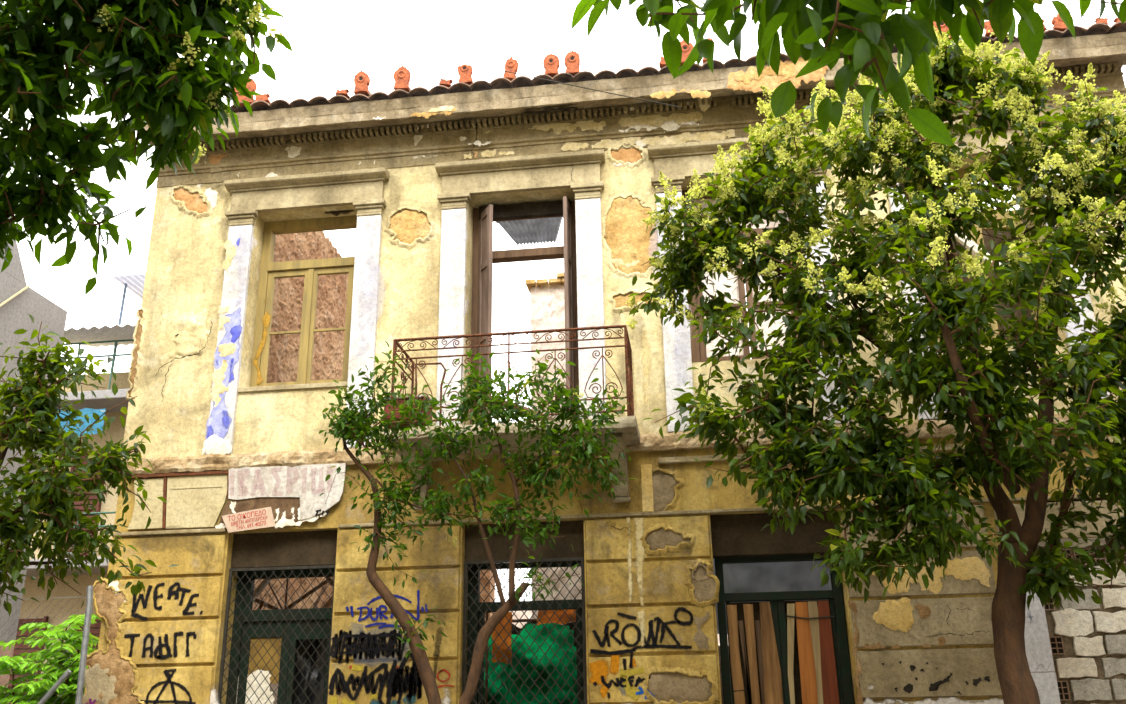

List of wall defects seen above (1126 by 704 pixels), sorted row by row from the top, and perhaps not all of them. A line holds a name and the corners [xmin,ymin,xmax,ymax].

spalling [727,56,828,93]
peeling [528,88,735,169]
spalling [169,184,218,219]
spalling [384,206,436,250]
spalling [601,192,659,313]
crack [155,320,212,401]
peeling [202,305,242,455]
spalling [637,467,720,650]
peeling [872,556,991,632]
spalling [82,577,144,704]
peeling [236,670,274,704]
peeling [848,601,1004,704]